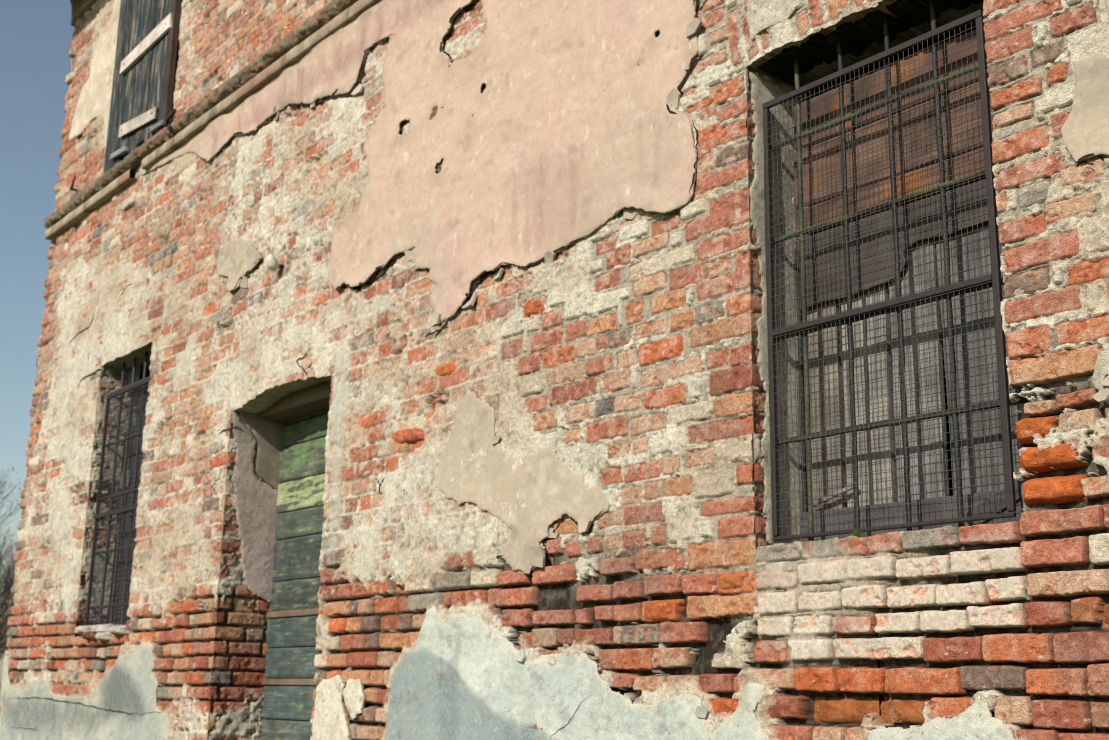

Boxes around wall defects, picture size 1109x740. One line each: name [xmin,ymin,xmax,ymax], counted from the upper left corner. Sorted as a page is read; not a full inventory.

flaking render [69,0,121,147]
flaking render [1061,56,1109,163]
flaking render [140,0,703,327]
flaking render [1091,343,1109,422]
flaking render [232,411,285,603]
flaking render [435,390,610,574]
spalling [1015,415,1109,505]
flaking render [0,646,169,740]
crack [15,697,162,731]
flaking render [312,674,366,740]
flaking render [386,606,767,740]
flaking render [815,698,1016,740]